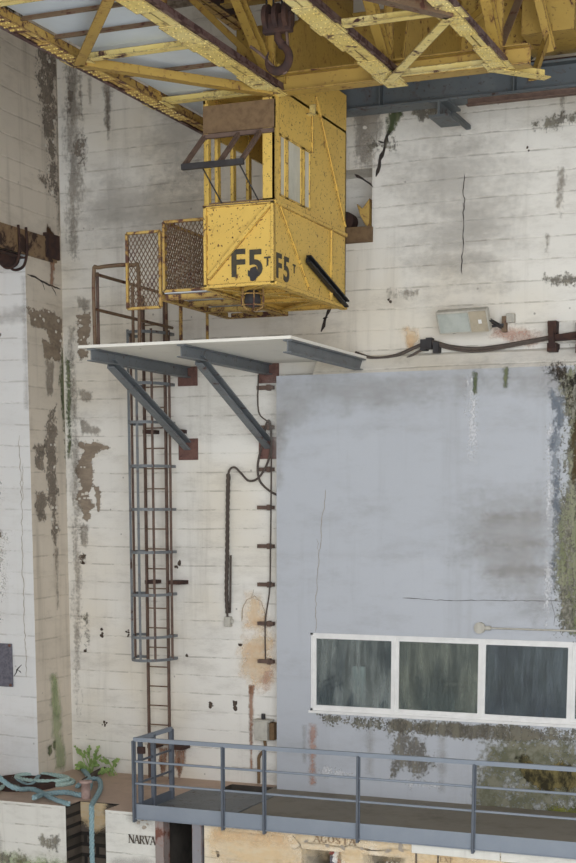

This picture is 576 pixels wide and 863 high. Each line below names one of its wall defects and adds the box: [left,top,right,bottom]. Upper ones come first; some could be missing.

crack [459,175,467,273]
peeling [26,306,62,362]
peeling [33,404,59,552]
peeling [75,440,109,521]
crack [315,489,326,632]
leakage [543,389,576,611]
rust [243,638,272,769]
leakage [388,733,435,778]